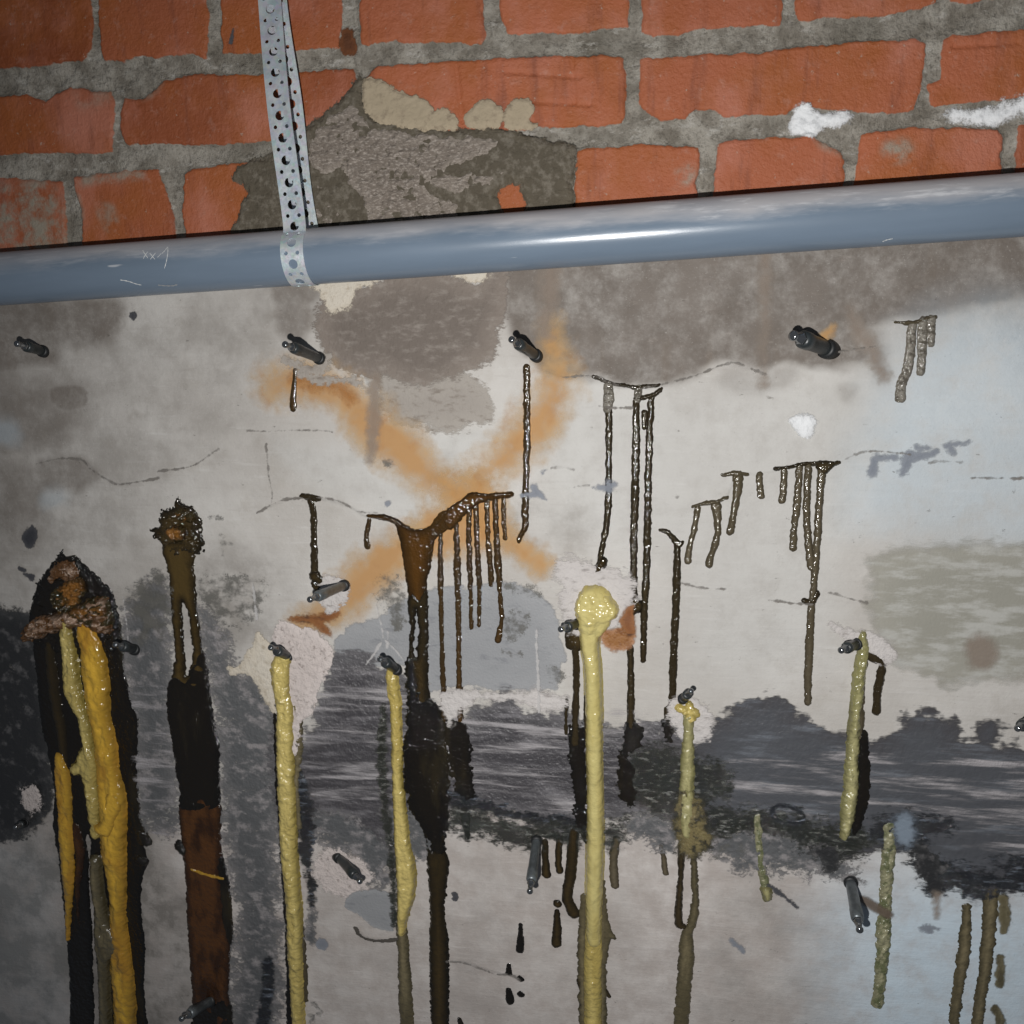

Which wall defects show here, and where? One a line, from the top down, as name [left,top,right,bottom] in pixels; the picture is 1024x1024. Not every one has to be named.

efflorescence [788,103,853,138]
damp [33,642,110,1024]
damp [105,648,152,1024]
crack [56,450,217,485]
damp [150,495,234,1024]
spalling [226,620,335,756]
rust [288,538,404,636]
rust [262,322,570,576]
damp [334,364,587,1024]
rust [601,605,636,651]
damp [591,375,841,889]
damp [659,753,1024,1024]